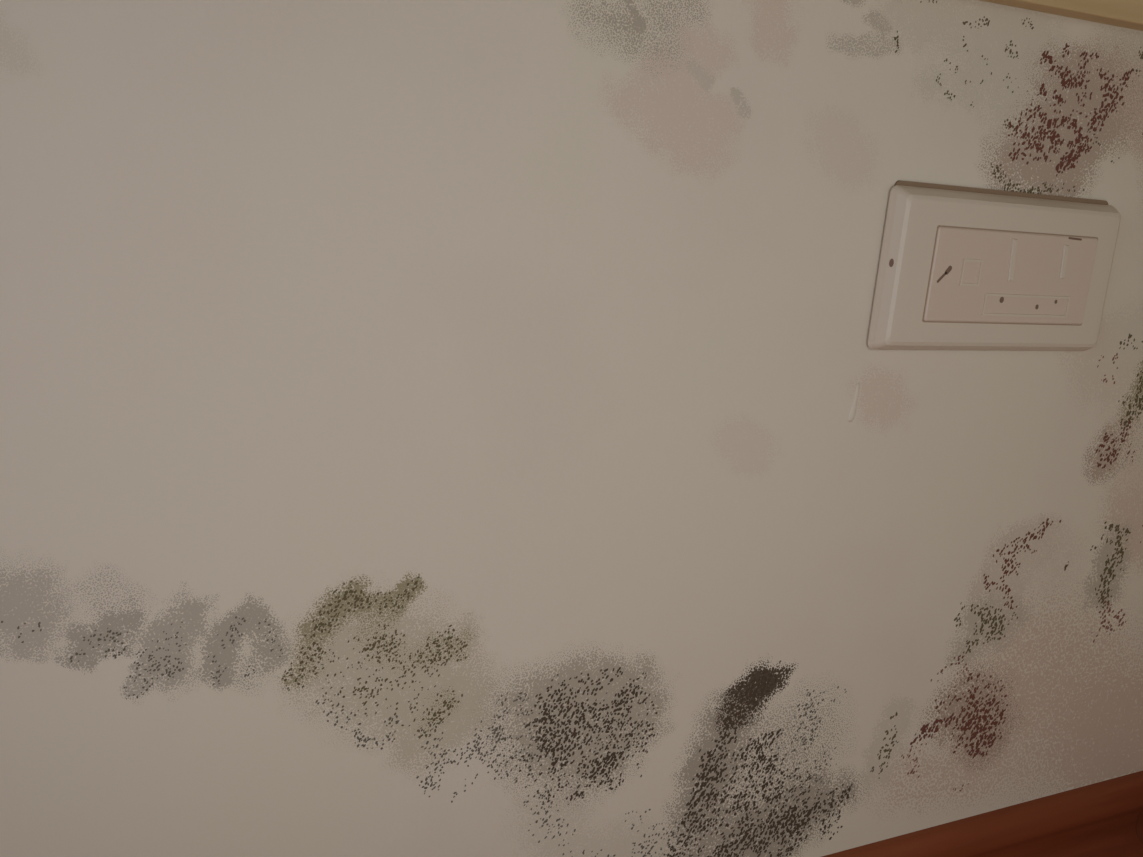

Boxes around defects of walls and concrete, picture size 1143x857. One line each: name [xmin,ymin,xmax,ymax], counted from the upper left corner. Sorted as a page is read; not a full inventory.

leakage [825,0,1143,214]
leakage [0,296,1143,857]